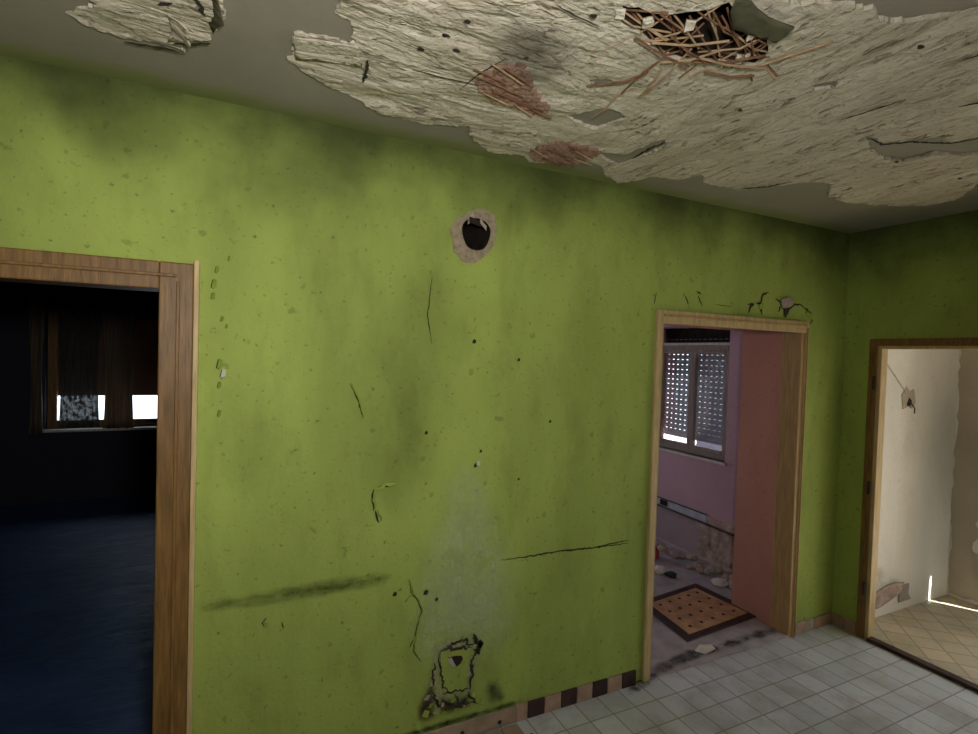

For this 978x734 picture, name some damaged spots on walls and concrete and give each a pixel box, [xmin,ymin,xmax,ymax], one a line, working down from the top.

spalling [65,0,226,55]
spalling [287,0,978,206]
spalling [449,208,497,264]
flaking render [948,350,978,602]
crack [502,540,629,561]
crack [405,579,484,711]